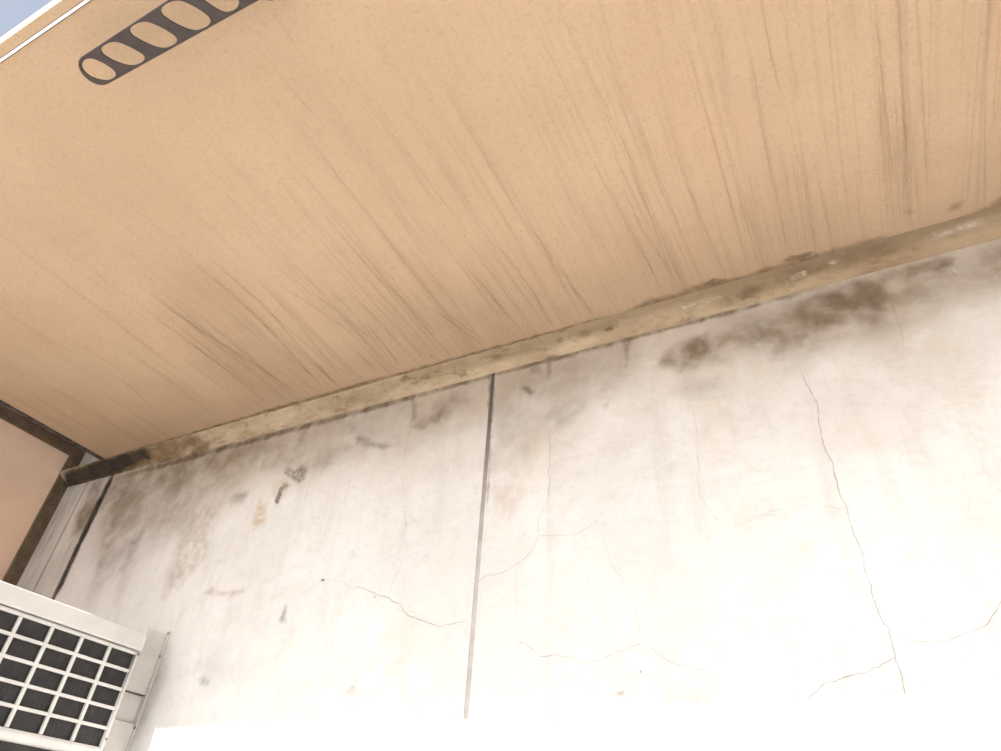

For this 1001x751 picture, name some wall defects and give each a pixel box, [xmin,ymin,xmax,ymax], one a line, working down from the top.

damp [56,481,111,591]